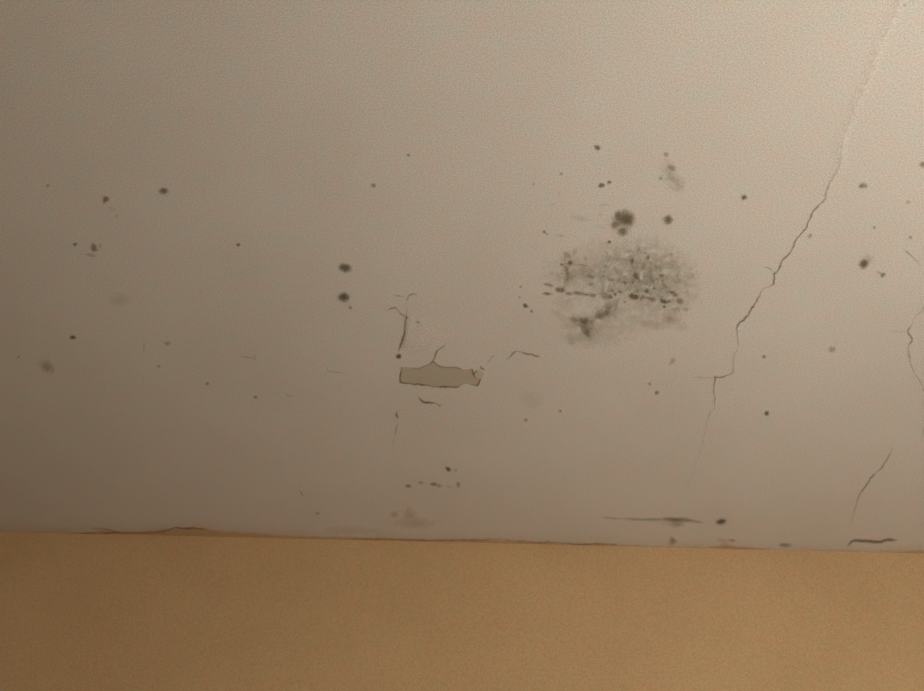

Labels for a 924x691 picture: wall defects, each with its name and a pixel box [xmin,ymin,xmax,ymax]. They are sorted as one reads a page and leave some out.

damp [539,203,708,352]
peeling [400,350,484,388]
crack [851,537,892,545]